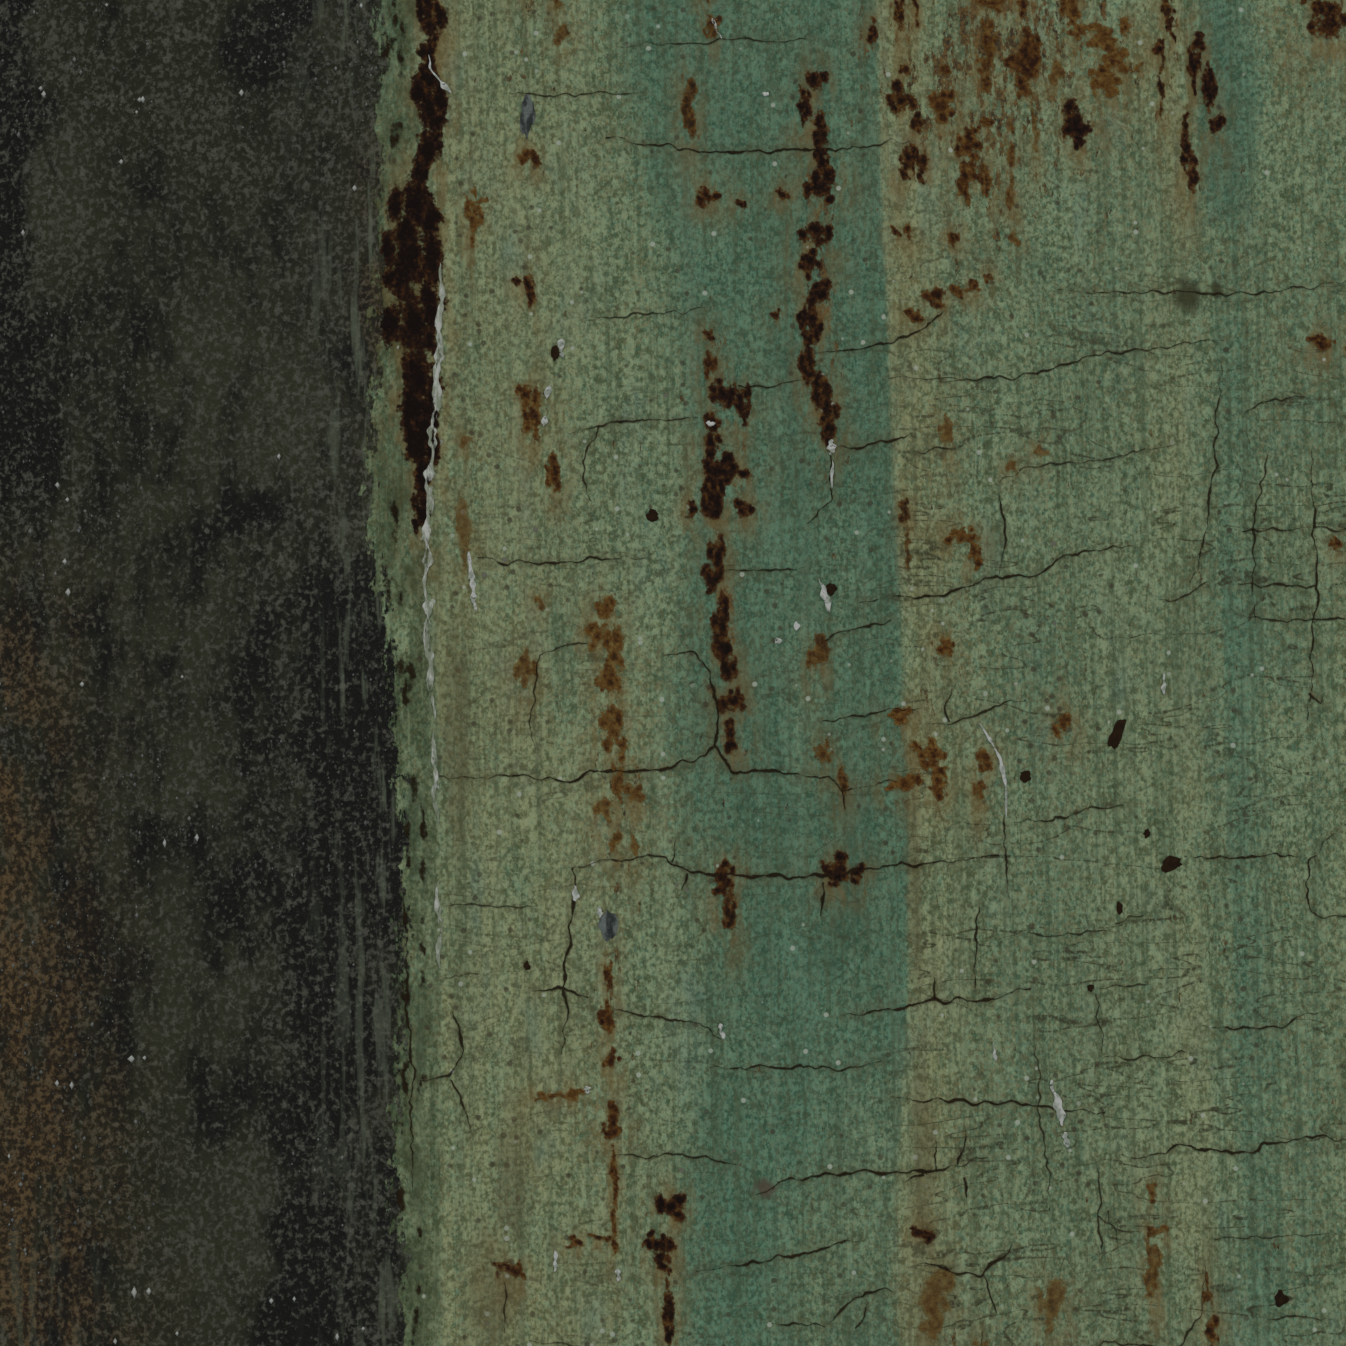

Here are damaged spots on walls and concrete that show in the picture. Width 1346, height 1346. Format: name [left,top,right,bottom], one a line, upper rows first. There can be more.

rust [885,63,1015,211]
rust [975,0,1065,158]
rust [1058,0,1226,194]
rust [377,0,451,535]
crack [825,444,1175,641]
crack [889,339,1346,720]
rust [584,594,647,857]
crack [439,642,896,809]
crack [537,804,1124,1072]
rust [641,1193,687,1346]
crack [757,1048,1105,1211]
crack [1097,1134,1346,1260]